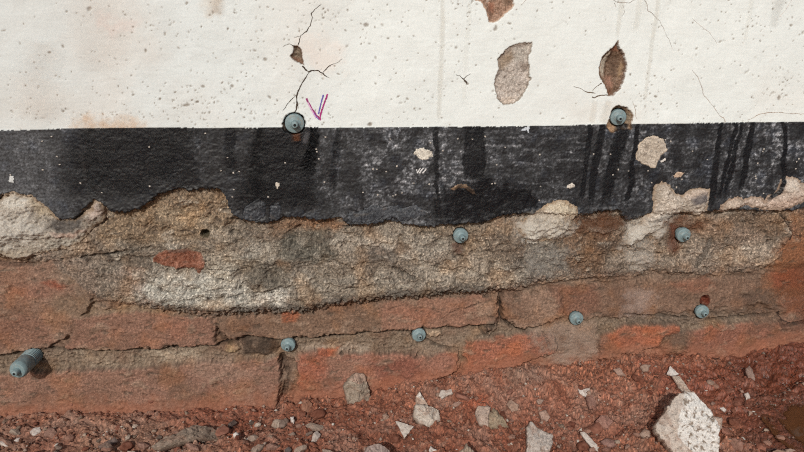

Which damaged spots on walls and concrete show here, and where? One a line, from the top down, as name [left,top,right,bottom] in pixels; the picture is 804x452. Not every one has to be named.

spalling [475,0,513,22]
crack [283,62,338,112]
spalling [494,42,532,104]
spalling [599,43,625,95]
leakage [225,128,235,171]
leakage [257,127,319,206]
leakage [433,126,537,223]
leakage [580,123,640,202]
peeling [635,136,667,168]
leakage [710,122,755,199]
leakage [769,122,788,199]
flaking render [153,248,205,274]